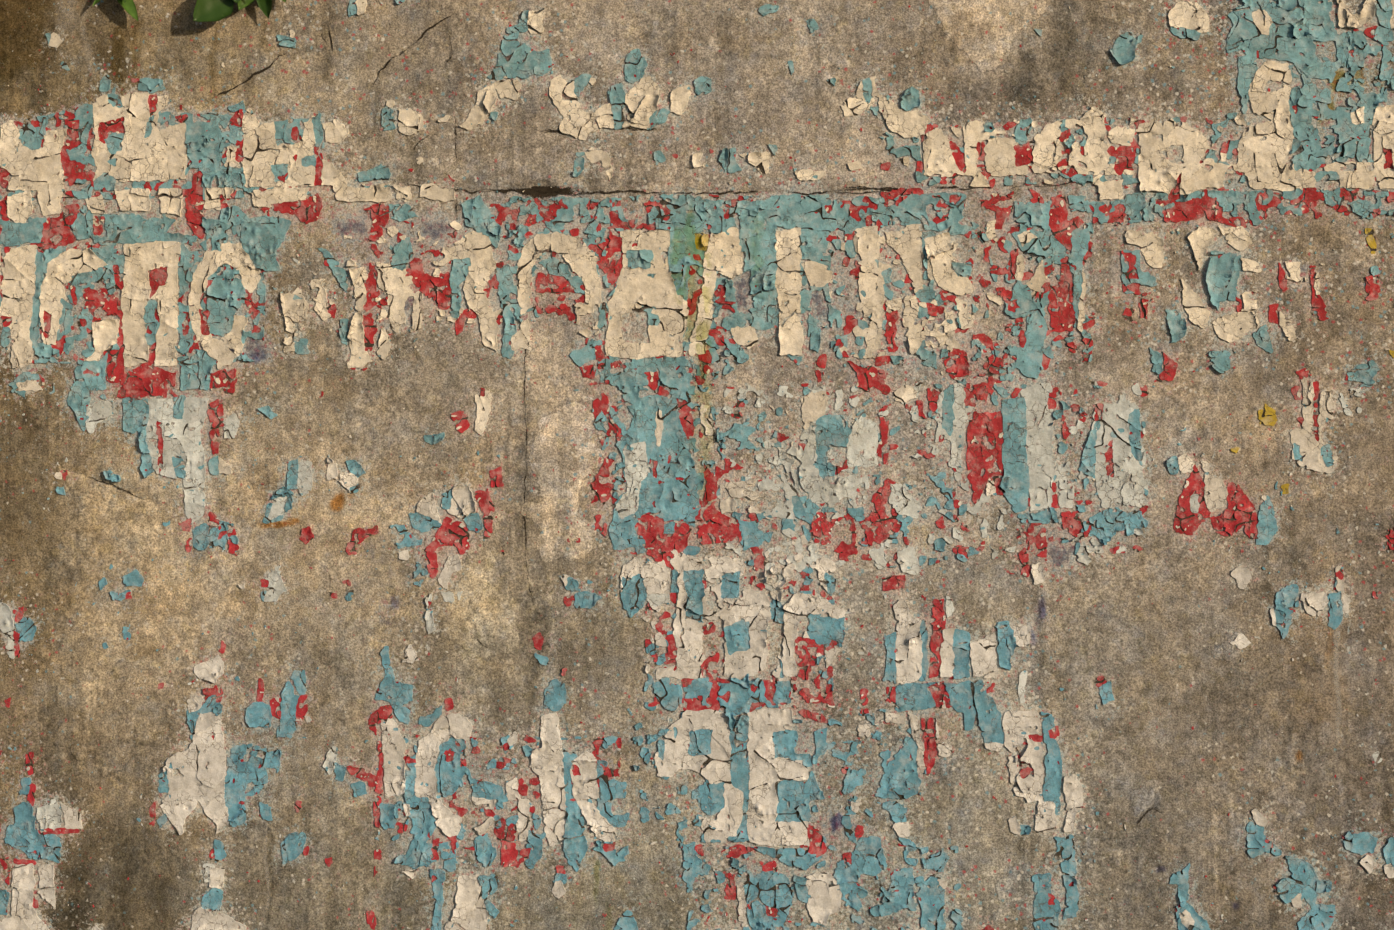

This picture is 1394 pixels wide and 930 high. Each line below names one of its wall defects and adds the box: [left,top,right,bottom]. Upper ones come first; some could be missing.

peeling [1104,6,1143,66]
peeling [381,99,424,136]
peeling [459,0,712,181]
peeling [692,144,780,184]
peeling [1278,251,1329,321]
peeling [254,454,366,524]
peeling [1166,360,1387,553]
spalling [337,451,552,665]
peeling [1270,564,1351,639]
peeling [0,738,94,930]
peeling [1246,775,1394,930]
peeling [1148,863,1241,930]